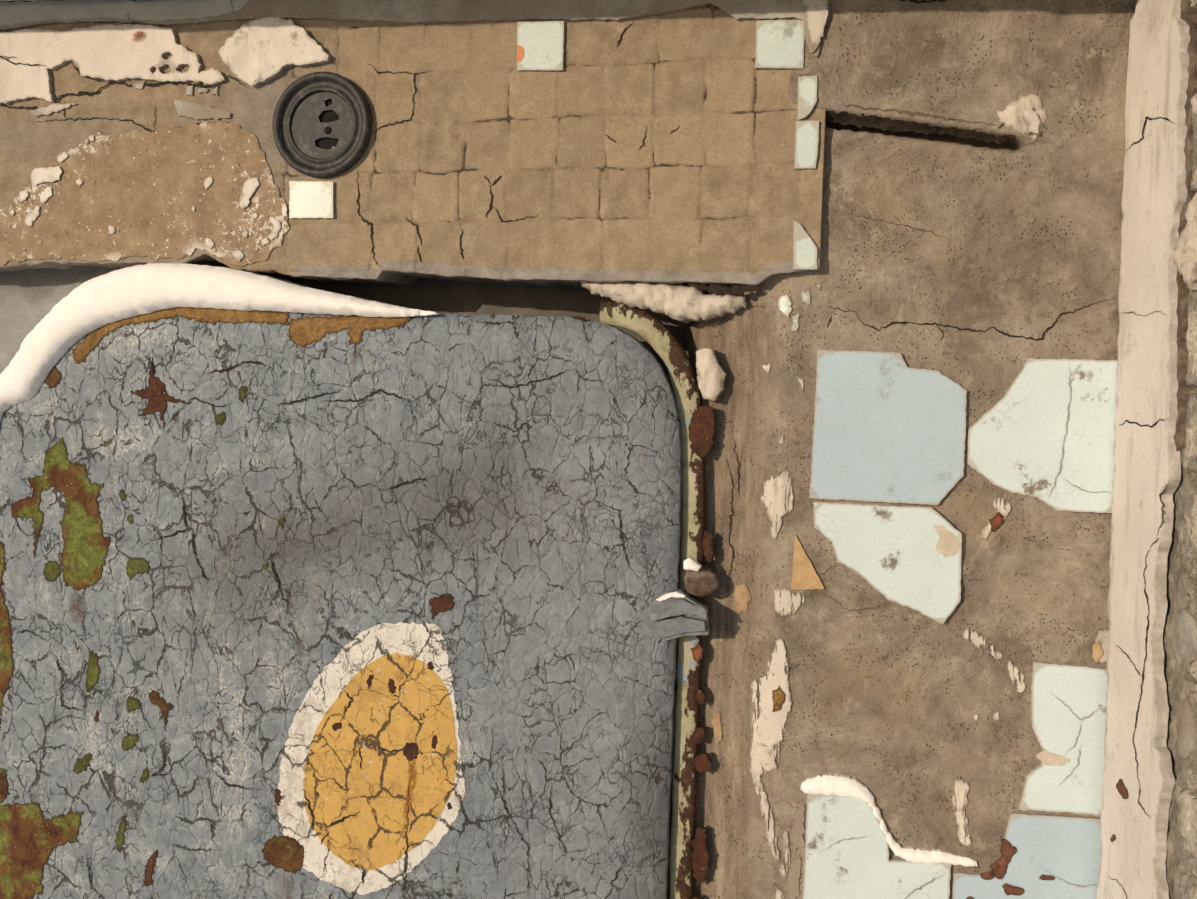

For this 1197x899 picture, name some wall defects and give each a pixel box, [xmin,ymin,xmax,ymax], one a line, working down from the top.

peeling [0,16,331,120]
crack [822,104,1016,144]
peeling [9,152,68,226]
crack [827,299,1166,341]
corrosion [130,358,192,430]
corrosion [688,406,716,458]
peeling [760,471,794,540]
crack [1116,483,1169,818]
peeling [749,639,806,899]
crack [303,789,360,844]
corrosion [261,835,304,888]
corrosion [980,838,1024,896]